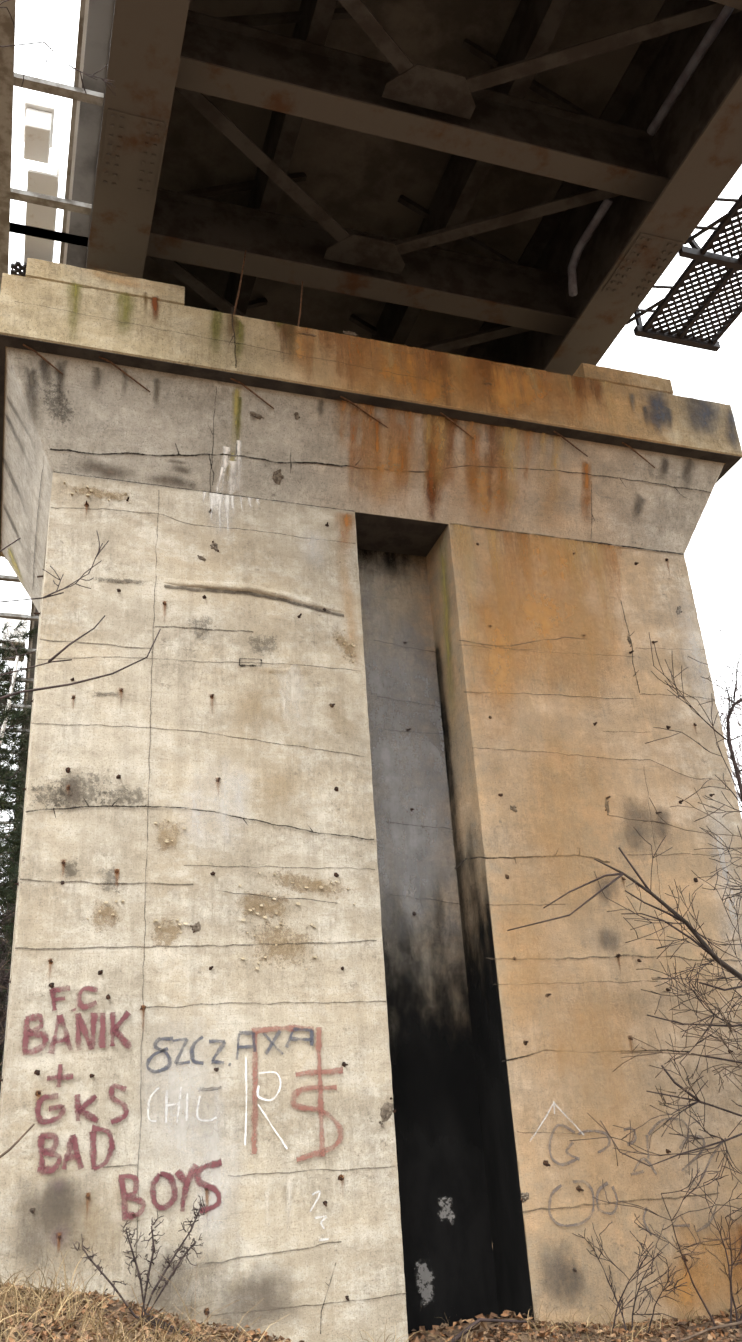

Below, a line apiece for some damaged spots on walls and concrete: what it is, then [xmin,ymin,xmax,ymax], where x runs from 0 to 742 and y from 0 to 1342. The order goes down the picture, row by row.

water stain [71,283,79,314]
water stain [212,311,243,351]
water stain [84,462,124,476]
water stain [155,388,258,521]
crack [33,307,711,565]
corrosion [275,323,609,516]